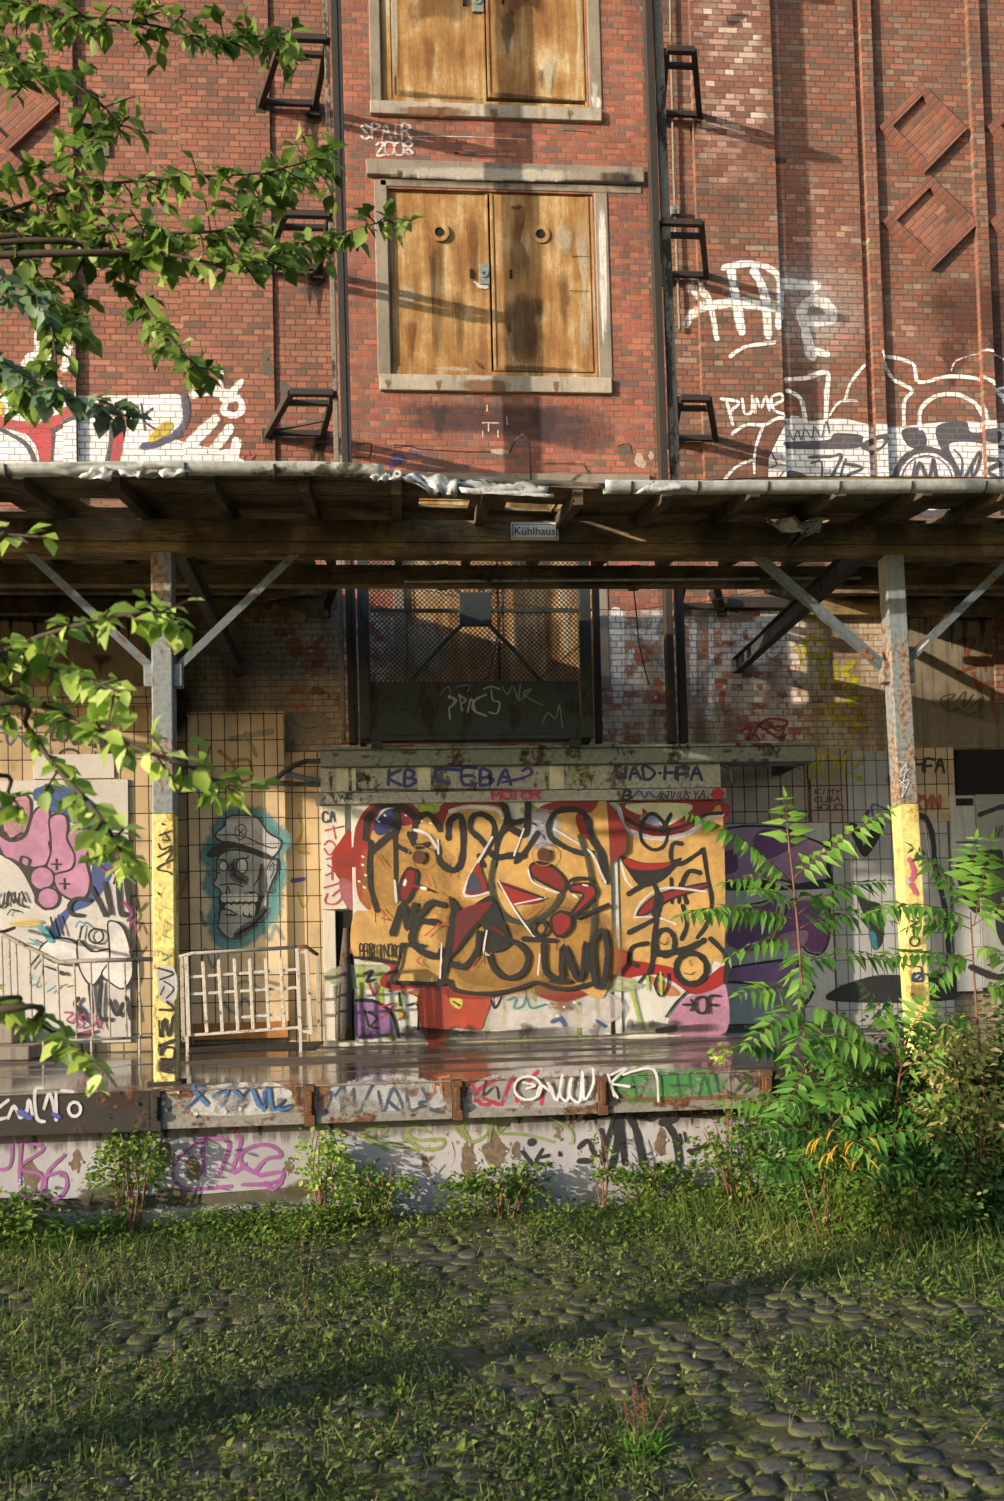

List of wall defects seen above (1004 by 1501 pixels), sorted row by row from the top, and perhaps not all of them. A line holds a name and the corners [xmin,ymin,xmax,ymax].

rust [283,1080,330,1108]
rust [434,1074,478,1099]
peeling [554,1114,586,1141]
peeling [654,1127,668,1156]
peeling [158,1141,202,1181]
peeling [282,1159,294,1176]
peeling [460,1129,524,1188]